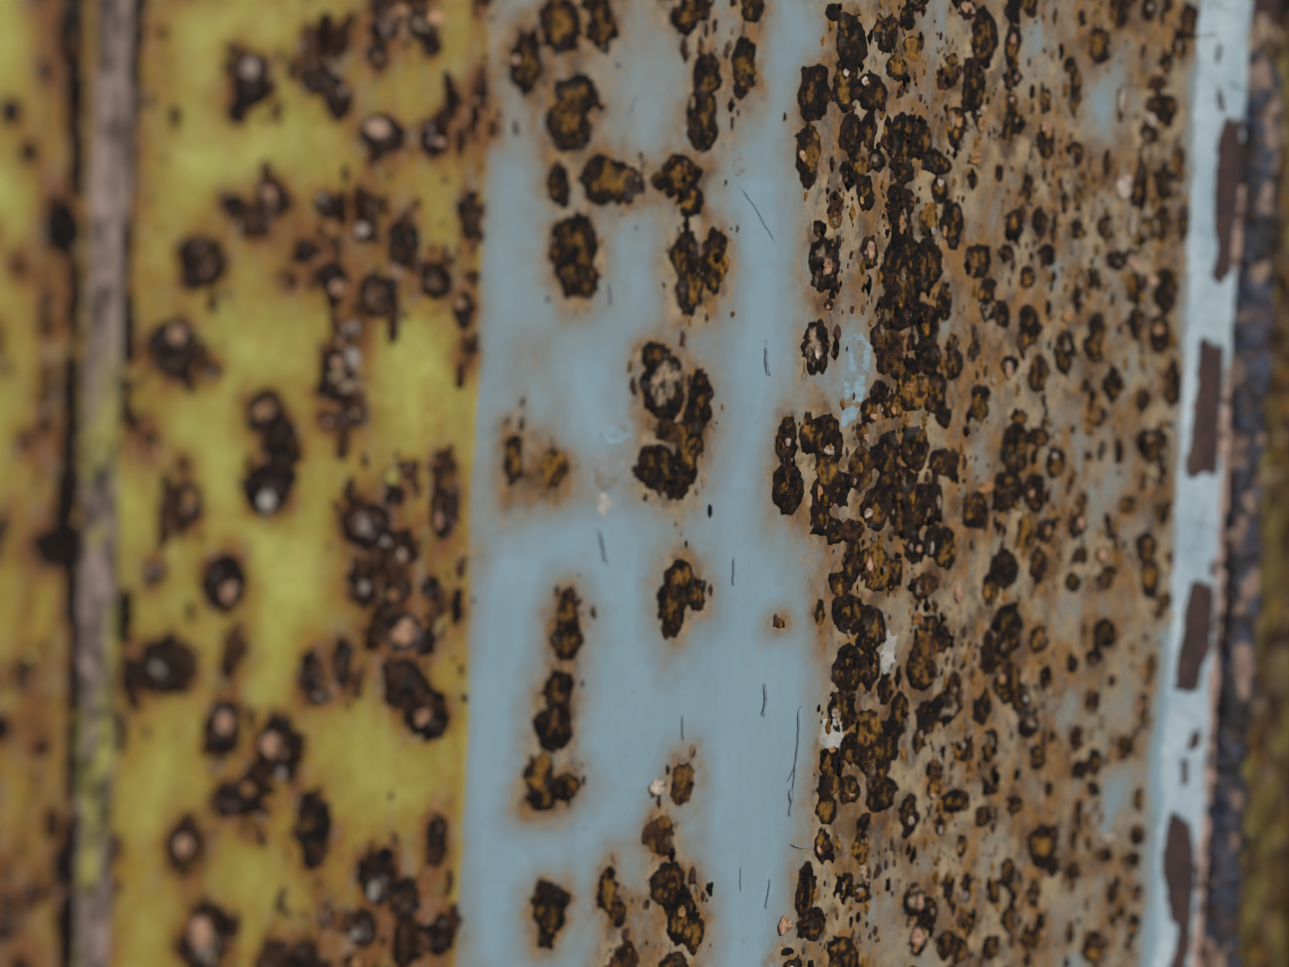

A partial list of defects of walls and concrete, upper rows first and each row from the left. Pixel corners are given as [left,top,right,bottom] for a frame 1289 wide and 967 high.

corrosion [765,0,1201,967]
peeling [1161,337,1234,967]
peeling [1211,85,1245,286]
corrosion [1240,124,1289,967]
corrosion [1270,0,1289,65]